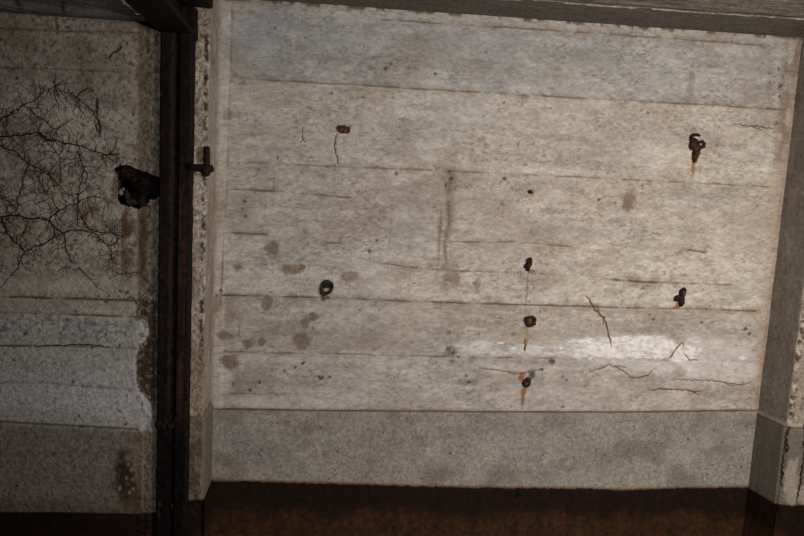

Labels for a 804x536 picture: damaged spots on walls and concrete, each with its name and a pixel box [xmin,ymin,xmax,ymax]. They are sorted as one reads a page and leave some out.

crack [94,97,102,137]
hole [114,164,160,208]
efflorescence [455,335,705,376]
crack [585,295,755,395]
crack [780,425,804,505]